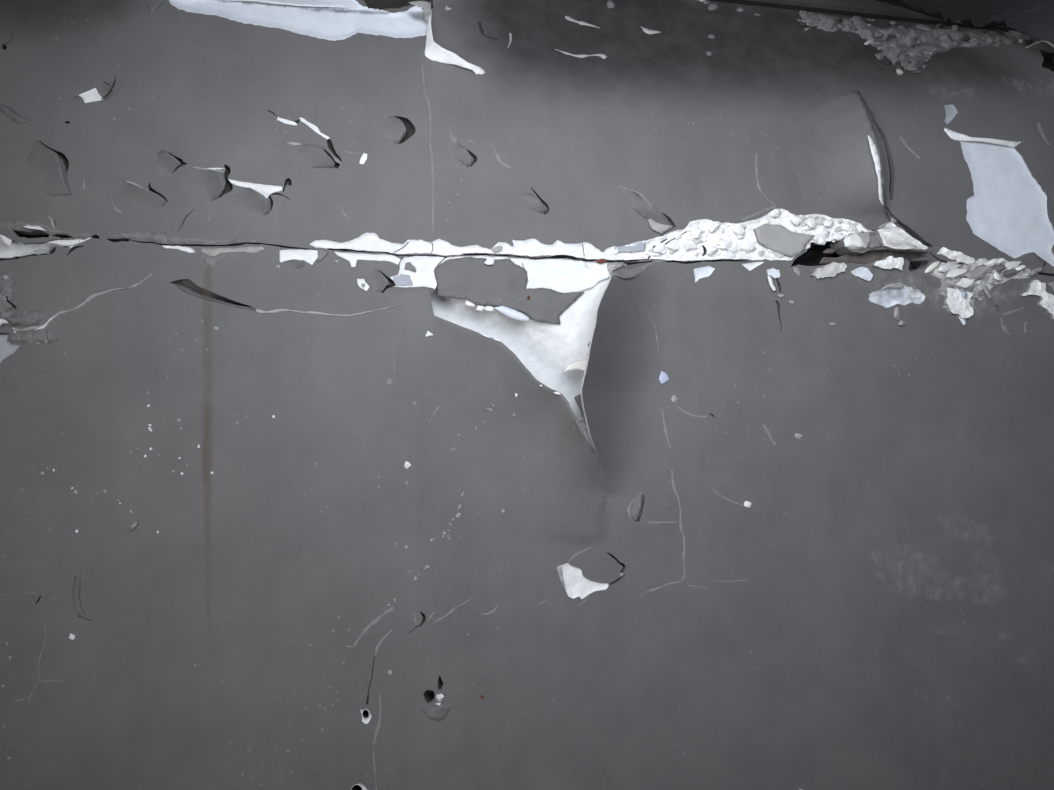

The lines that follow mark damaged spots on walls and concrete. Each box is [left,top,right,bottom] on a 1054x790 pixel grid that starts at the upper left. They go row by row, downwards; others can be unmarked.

peeling [169,0,485,74]
spalling [0,216,92,259]
spalling [161,245,266,256]
crack [0,209,748,265]
peeling [169,279,257,311]
peeling [267,90,1054,482]
crack [775,279,795,332]
peeling [0,319,20,363]
peeling [557,547,626,599]